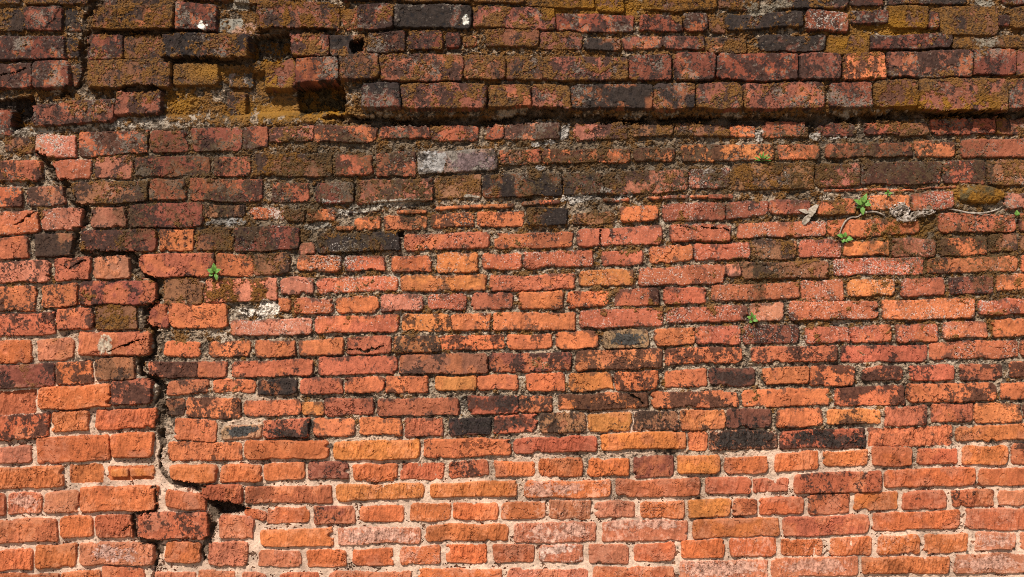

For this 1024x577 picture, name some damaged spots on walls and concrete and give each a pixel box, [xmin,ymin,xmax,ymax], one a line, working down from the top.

crack [59,0,337,98]
crack [36,150,224,577]